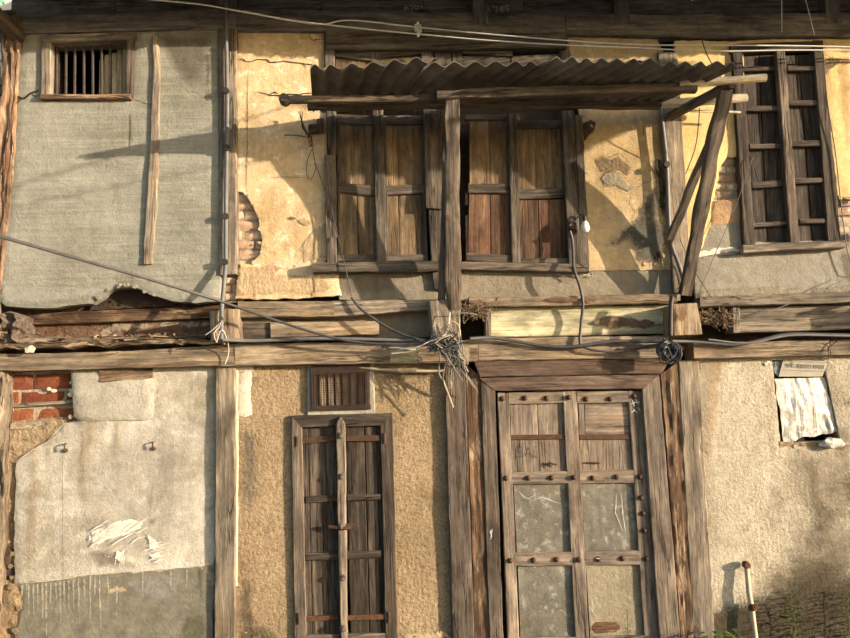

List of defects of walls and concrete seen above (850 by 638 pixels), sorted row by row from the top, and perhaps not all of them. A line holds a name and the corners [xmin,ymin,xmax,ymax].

crack [16,90,40,104]
crack [239,58,312,192]
flaking render [225,193,332,303]
flaking render [596,153,634,194]
spalling [699,158,741,258]
flaking render [837,195,850,248]
spalling [90,283,177,311]
spalling [4,540,15,586]
damp [16,554,215,638]
damp [713,477,850,638]